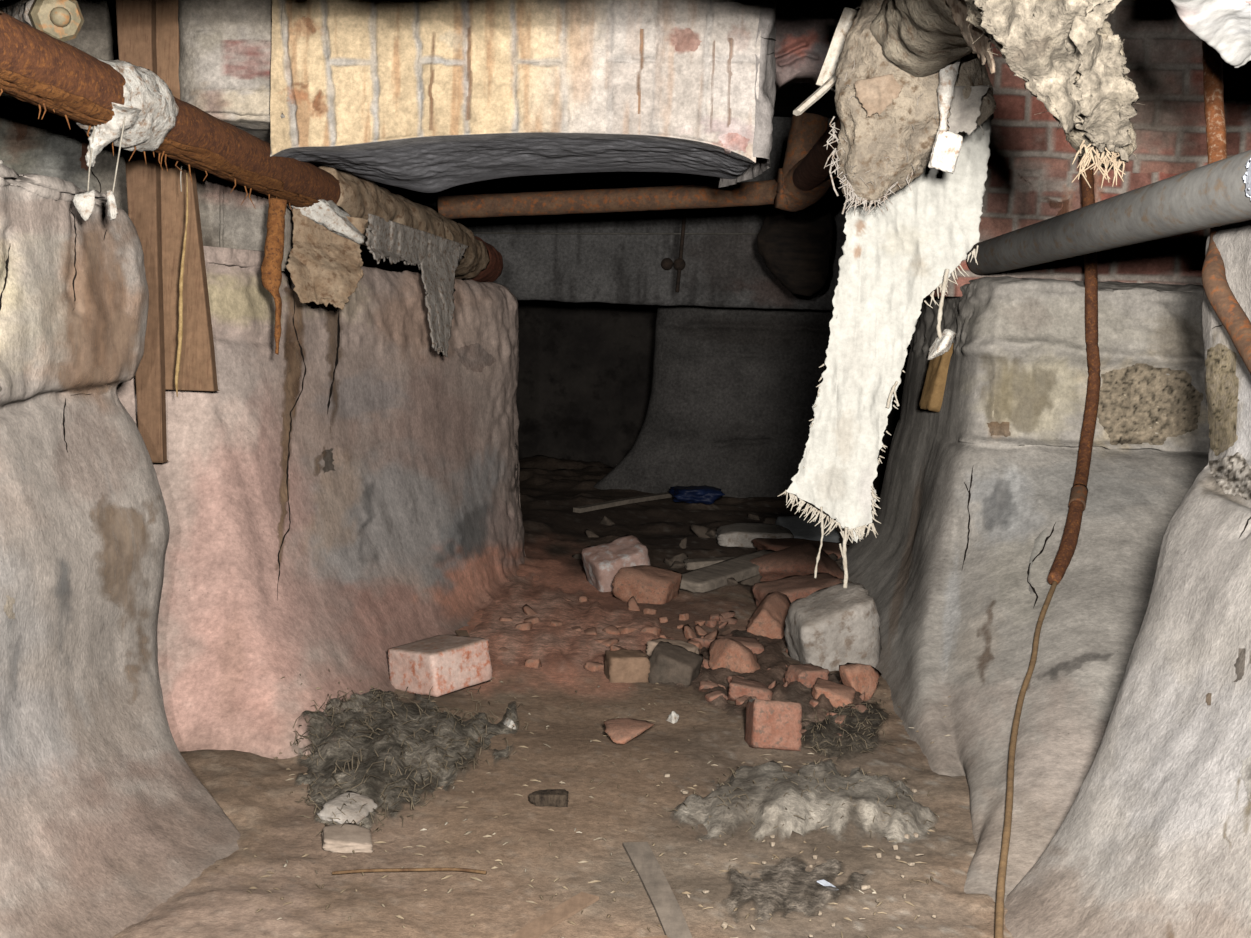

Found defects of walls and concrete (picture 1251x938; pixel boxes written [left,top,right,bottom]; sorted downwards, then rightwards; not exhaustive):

crack [0,247,10,310]
spalling [1097,343,1251,500]
crack [962,467,973,569]
crack [1027,522,1056,608]